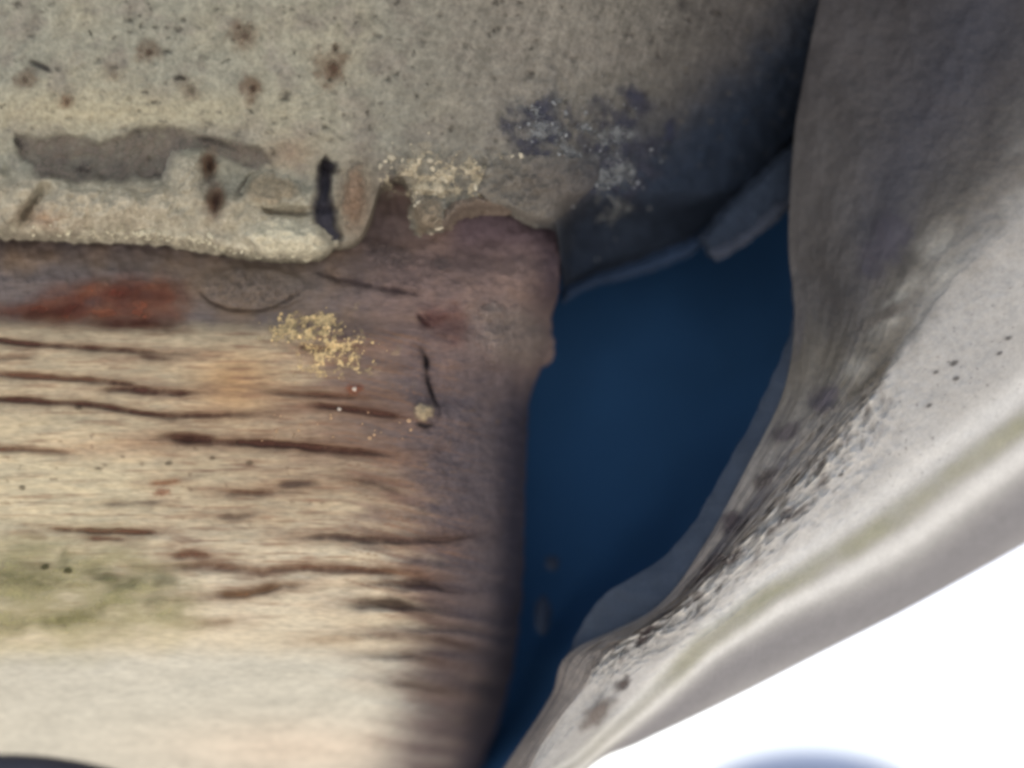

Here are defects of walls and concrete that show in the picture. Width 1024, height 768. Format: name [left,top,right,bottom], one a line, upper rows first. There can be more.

spalling [17,128,269,181]
spalling [321,160,336,173]
efflorescence [378,142,487,219]
peeling [442,144,600,233]
water stain [500,90,672,225]
rust [5,281,175,327]
water stain [584,701,608,727]